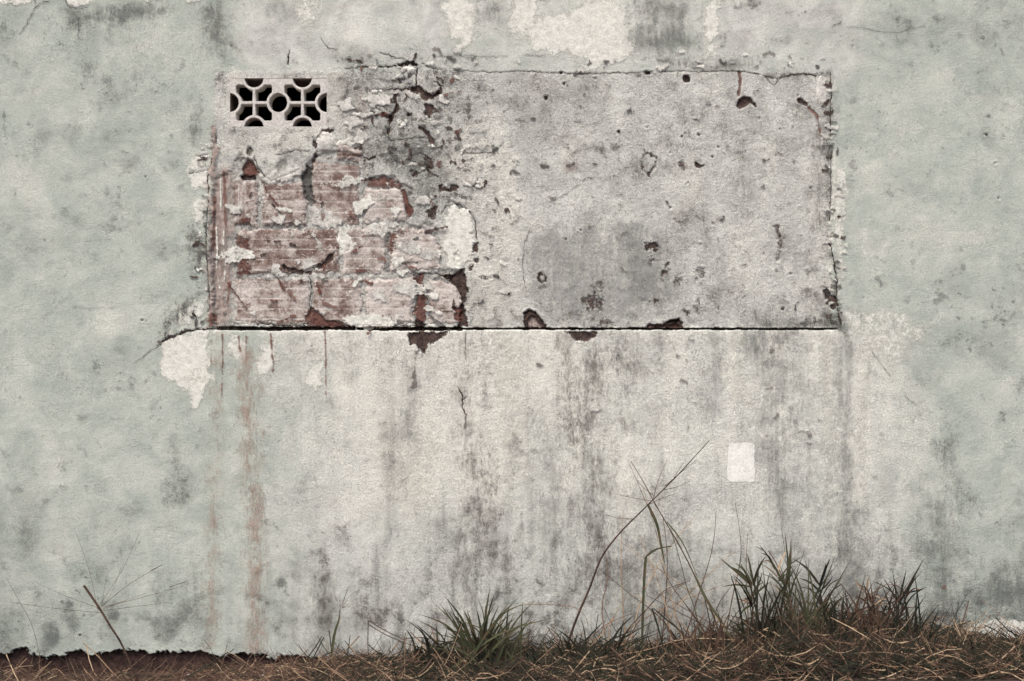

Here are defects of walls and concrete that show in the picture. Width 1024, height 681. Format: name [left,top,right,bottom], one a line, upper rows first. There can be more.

peeling [507,0,634,85]
crack [321,38,832,139]
peeling [636,0,794,109]
flaking render [157,0,523,409]
crack [133,137,842,364]
flaking render [523,310,547,329]
flaking render [565,267,627,342]
flaking render [643,300,700,342]